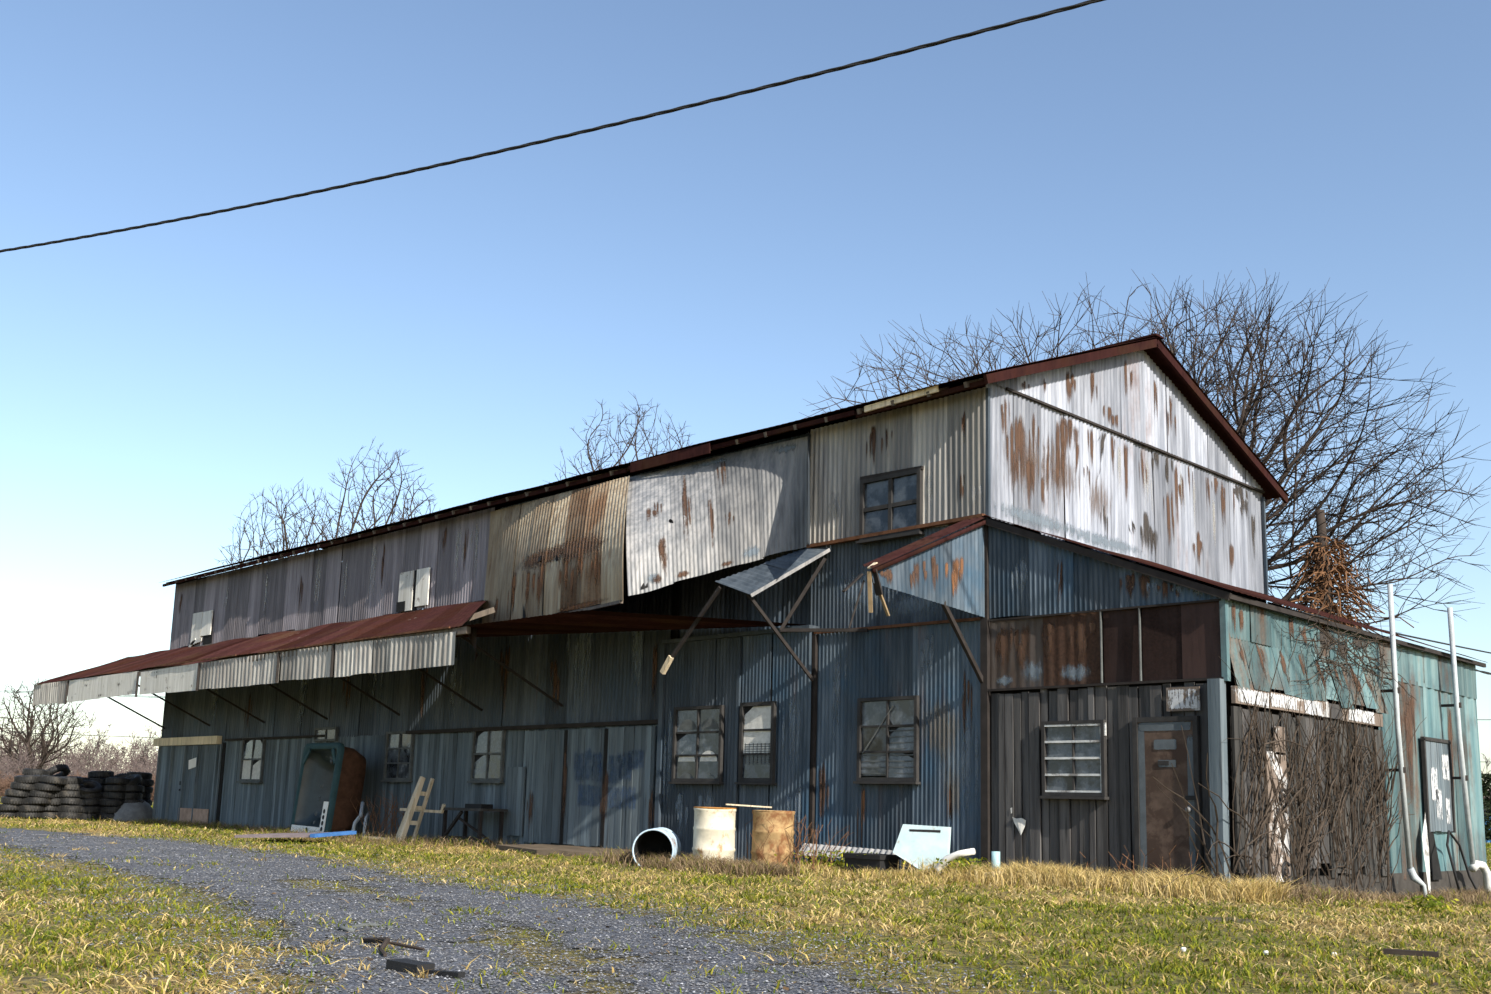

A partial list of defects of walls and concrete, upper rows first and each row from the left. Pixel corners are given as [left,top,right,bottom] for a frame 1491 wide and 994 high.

corrosion [866,427,892,461]
corrosion [1001,371,1255,553]
corrosion [682,478,734,538]
corrosion [653,538,689,583]
corrosion [1193,532,1202,560]